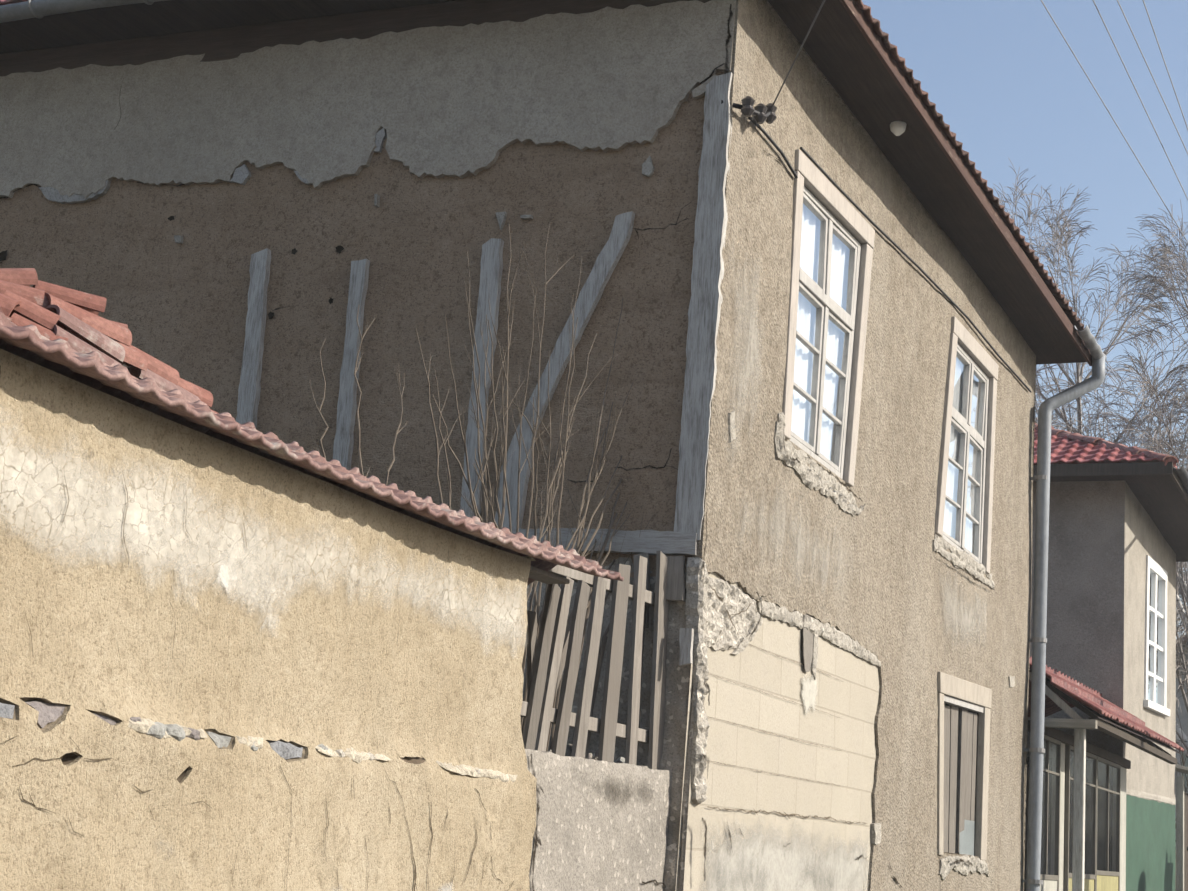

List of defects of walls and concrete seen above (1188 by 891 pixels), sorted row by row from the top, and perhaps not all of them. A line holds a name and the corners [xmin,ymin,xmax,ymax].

crack [700,4,733,93]
flaking render [0,71,725,531]
crack [122,474,130,565]
spalling [0,697,68,732]
spalling [88,710,119,725]
spalling [204,729,234,750]
spalling [266,740,305,762]
flaking render [580,552,881,891]
crack [323,803,369,889]
crack [388,754,544,891]